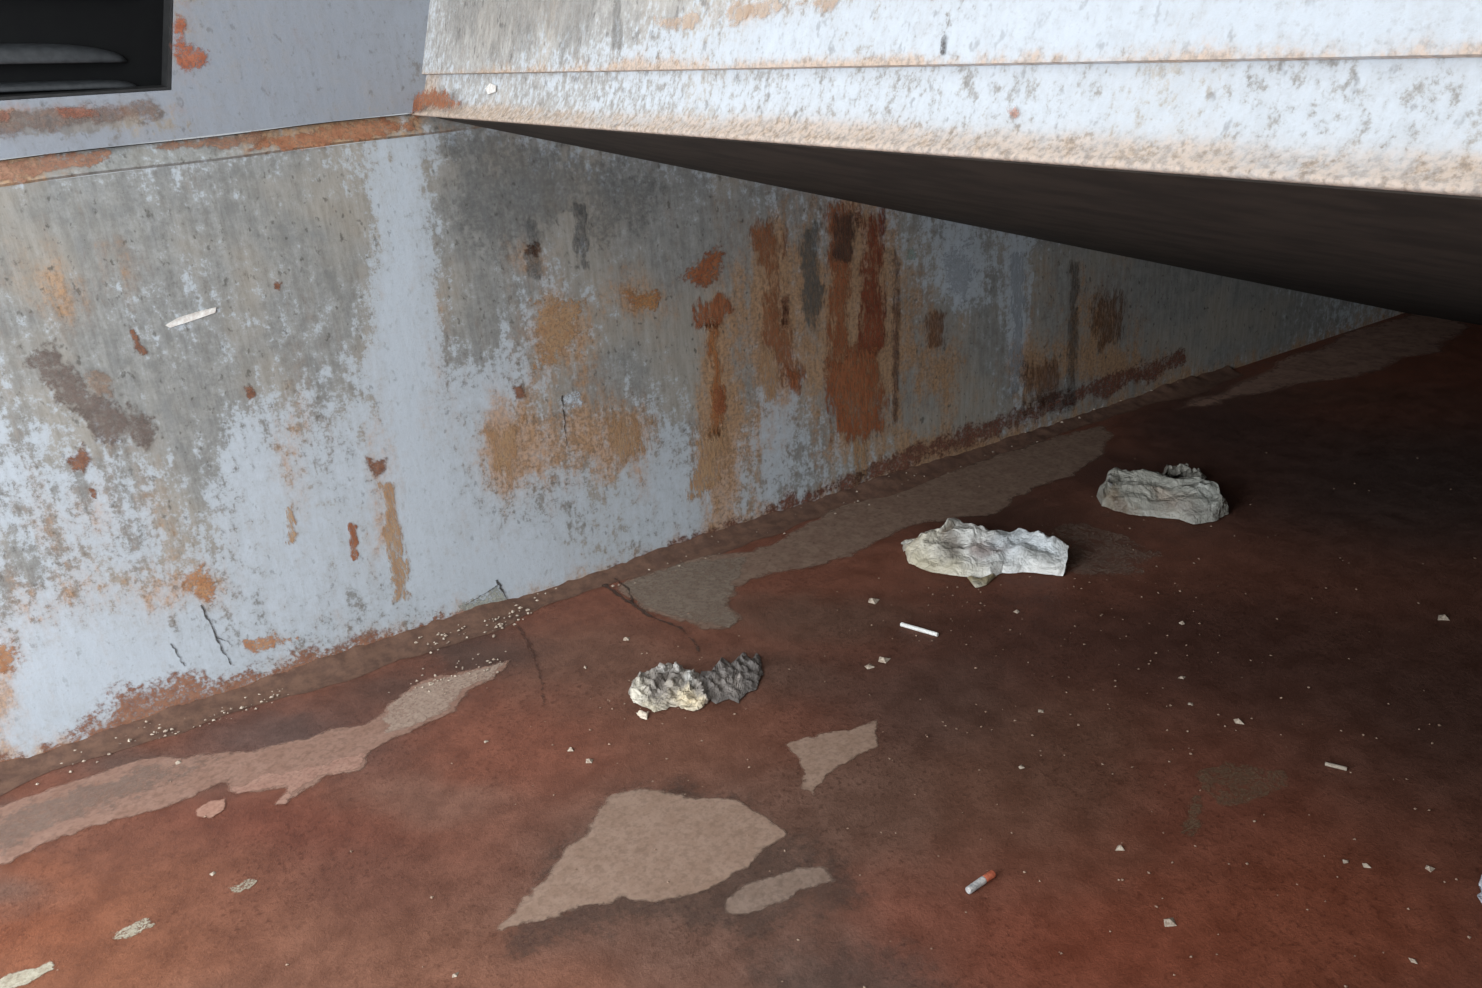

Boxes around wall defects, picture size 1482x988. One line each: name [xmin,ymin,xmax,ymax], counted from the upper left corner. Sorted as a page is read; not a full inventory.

corrosion [0,100,161,137]
corrosion [157,86,460,151]
corrosion [0,149,111,183]
corrosion [679,249,734,500]
corrosion [749,201,1186,513]
corrosion [348,523,359,561]
corrosion [378,483,411,602]
corrosion [0,641,19,674]
crack [201,605,231,665]
corrosion [40,612,451,753]
crack [471,580,545,705]
crack [602,578,699,651]